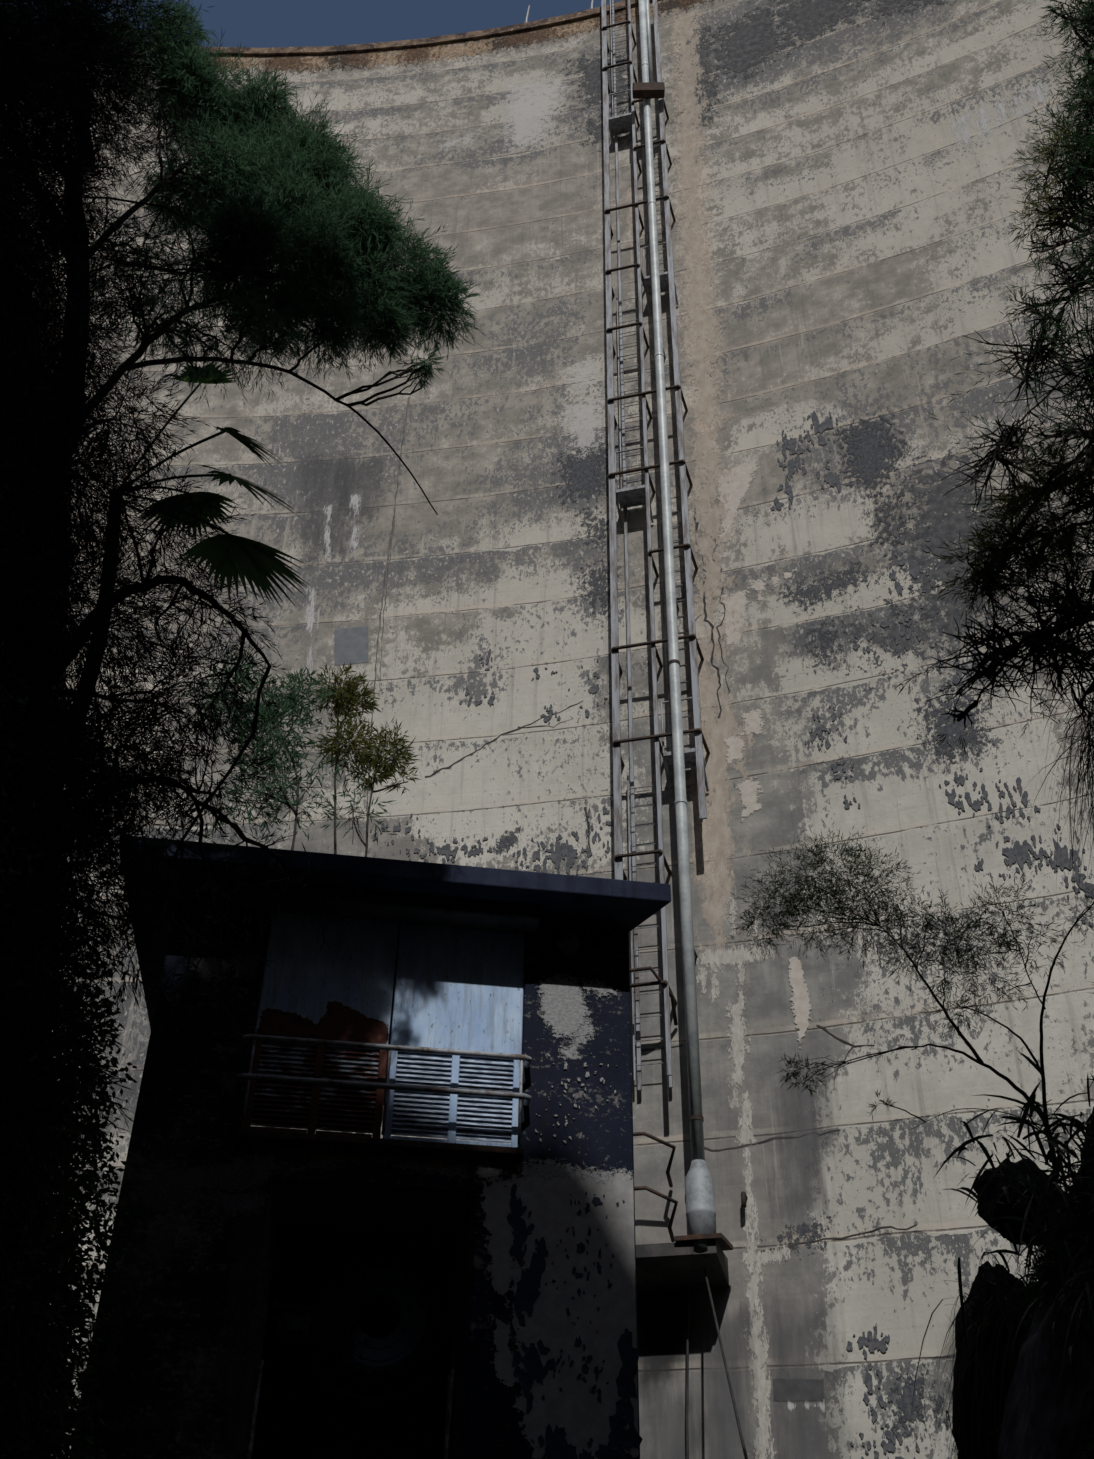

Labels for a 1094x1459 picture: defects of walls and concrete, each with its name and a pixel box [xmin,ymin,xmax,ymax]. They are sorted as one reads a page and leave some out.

water stain [306,458,371,558]
water stain [305,588,320,672]
crack [425,701,582,778]
water stain [664,0,971,1459]
peeling [470,924,643,1459]
water stain [655,1402,686,1459]